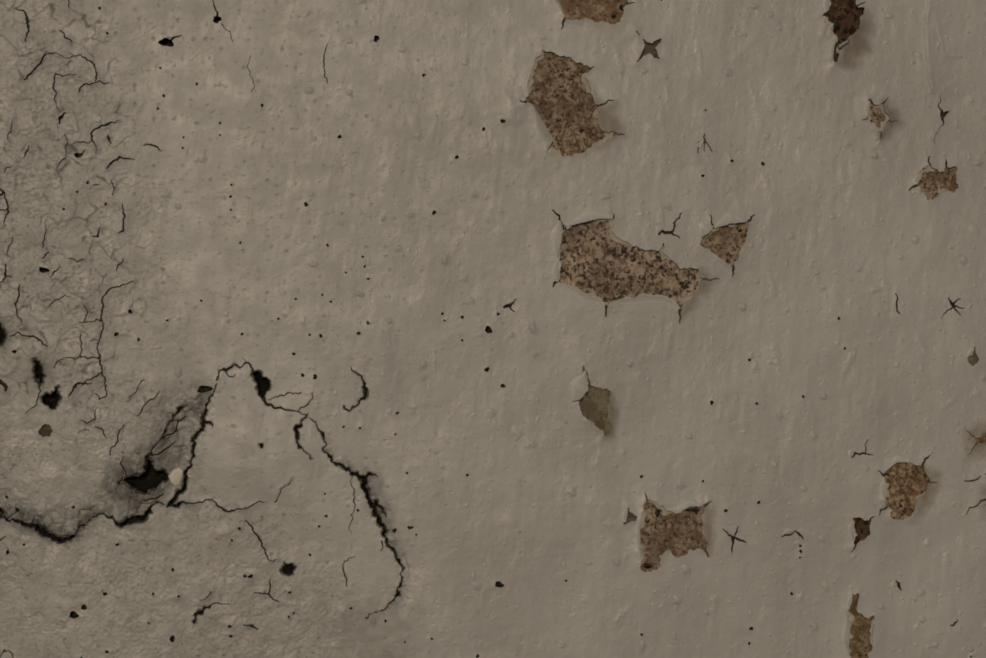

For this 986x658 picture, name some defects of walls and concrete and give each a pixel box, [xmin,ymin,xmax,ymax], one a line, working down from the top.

crack [16,9,162,237]
crack [321,43,329,84]
peeling [520,50,624,157]
peeling [823,0,865,62]
peeling [550,210,719,323]
spalling [31,358,62,409]
crack [0,120,292,602]
crack [343,367,369,411]
crack [268,392,405,619]
peeling [621,494,712,572]
peeling [848,455,937,552]
crack [192,591,230,623]